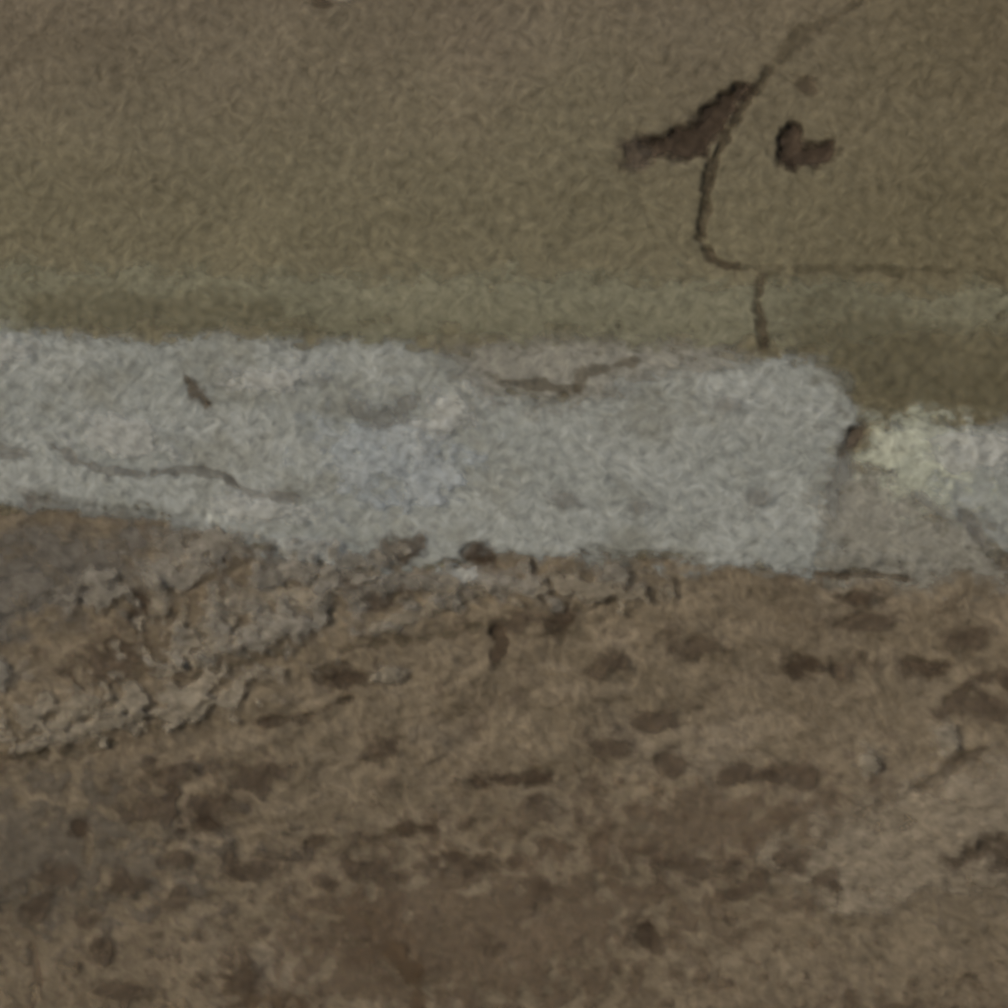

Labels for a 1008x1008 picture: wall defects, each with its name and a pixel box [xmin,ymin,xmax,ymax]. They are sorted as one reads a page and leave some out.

spalling [619,82,752,169]
crack [698,68,772,350]
spalling [777,122,835,172]
spalling [0,318,1008,1008]